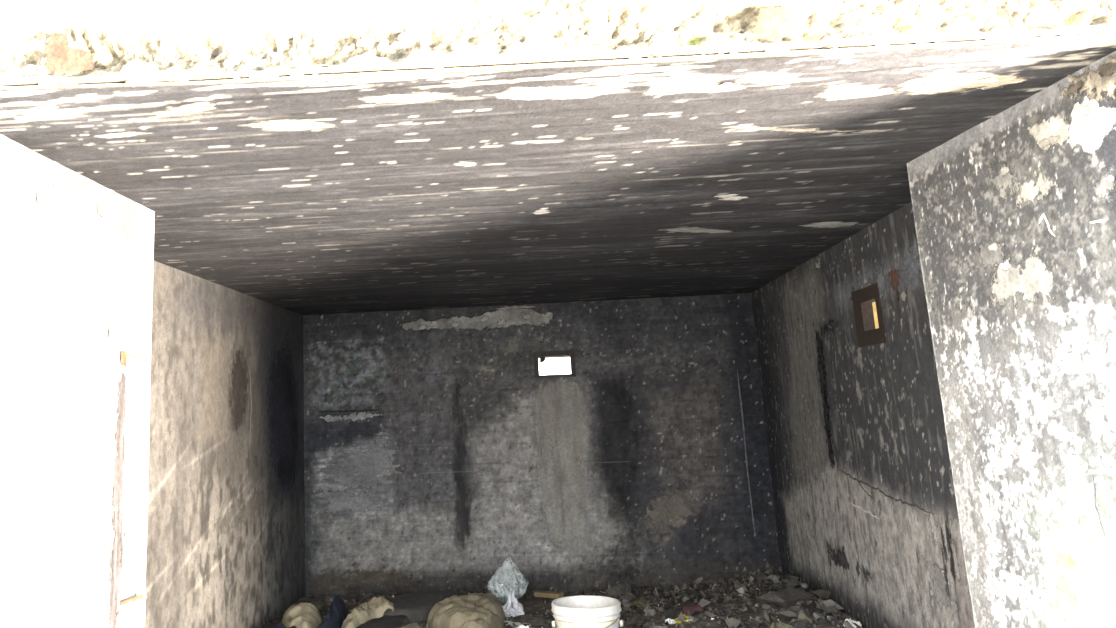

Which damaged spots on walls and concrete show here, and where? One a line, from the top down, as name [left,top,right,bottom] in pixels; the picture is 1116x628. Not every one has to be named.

corrosion [46,32,94,73]
spalling [0,0,1116,85]
corrosion [755,5,800,39]
peeling [247,119,334,131]
peeling [499,81,631,100]
peeling [815,72,1028,100]
peeling [1027,56,1116,153]
peeling [987,164,1054,207]
peeling [978,241,1054,308]
peeling [401,306,553,331]
leakage [453,384,470,547]
leakage [534,377,641,577]